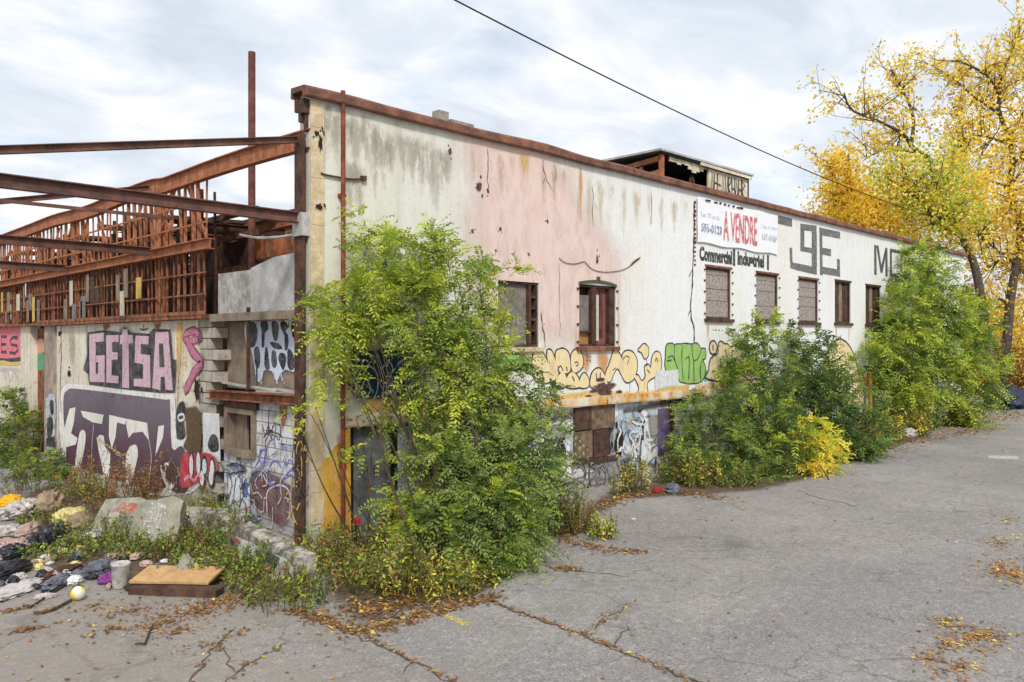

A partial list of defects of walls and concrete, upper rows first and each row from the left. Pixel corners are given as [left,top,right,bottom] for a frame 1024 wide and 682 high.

crack [688,201,696,344]
rust [547,378,801,401]